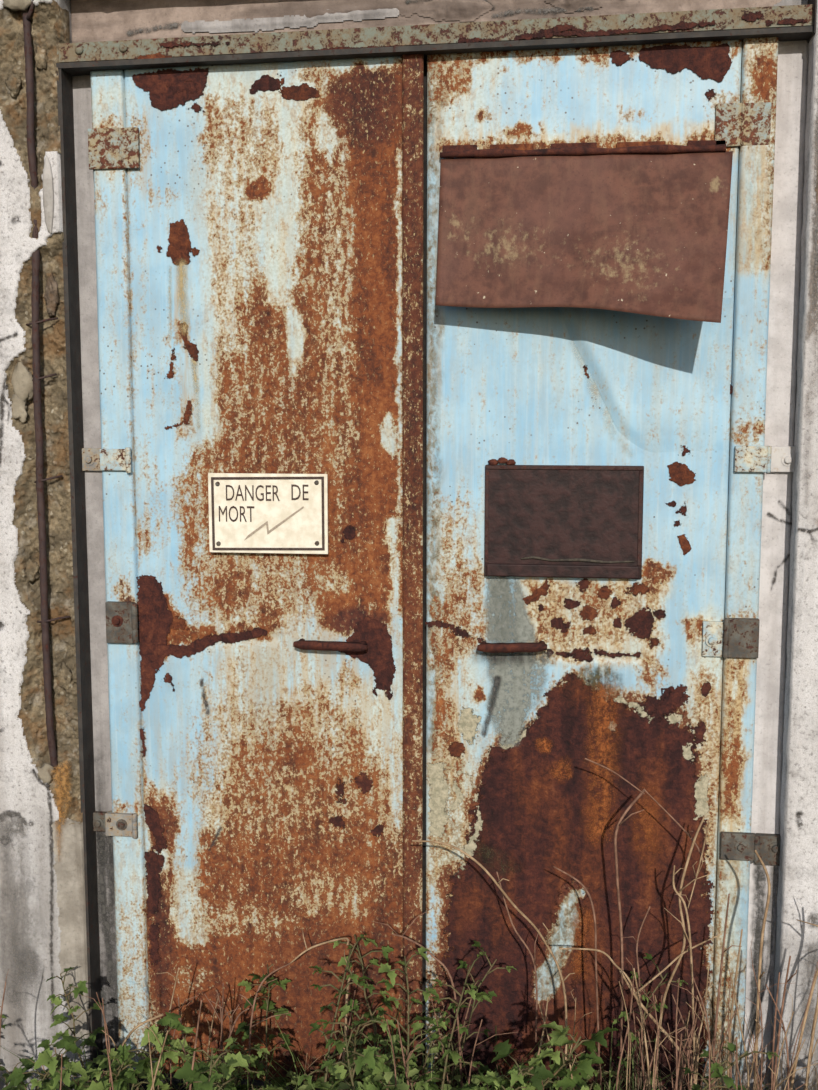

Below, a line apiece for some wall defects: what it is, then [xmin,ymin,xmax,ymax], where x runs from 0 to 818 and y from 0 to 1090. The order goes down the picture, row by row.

peeling [127,0,603,35]
rust [514,20,716,41]
rust [738,11,808,26]
rust [137,41,230,64]
rust [157,219,200,430]
rust [488,457,516,465]
spalling [0,0,90,1039]
rust [425,620,484,643]
rust [328,772,373,829]
rust [370,824,384,837]
rust [437,578,715,1090]
rust [143,804,167,970]